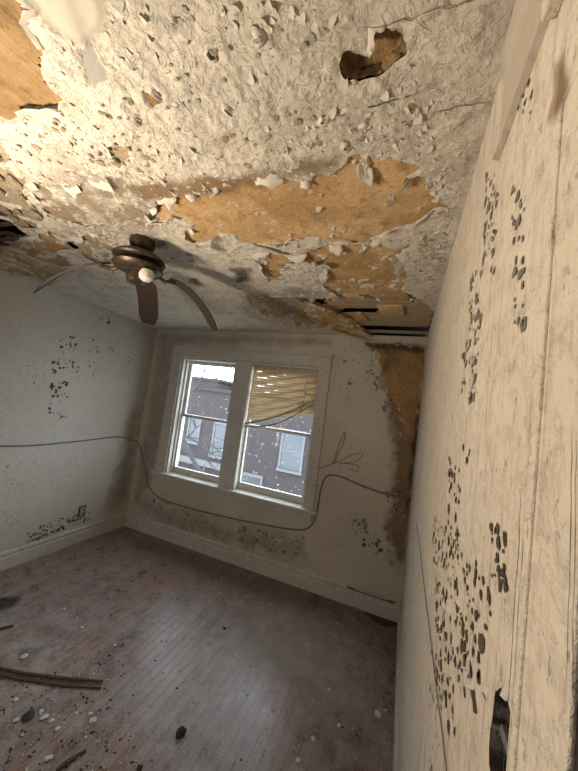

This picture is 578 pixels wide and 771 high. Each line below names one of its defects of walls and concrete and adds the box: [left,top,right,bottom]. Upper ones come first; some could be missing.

flaking render [0,0,463,454]
leakage [366,343,424,369]
leakage [385,401,419,561]
peeling [2,509,90,544]
mould [348,517,383,555]